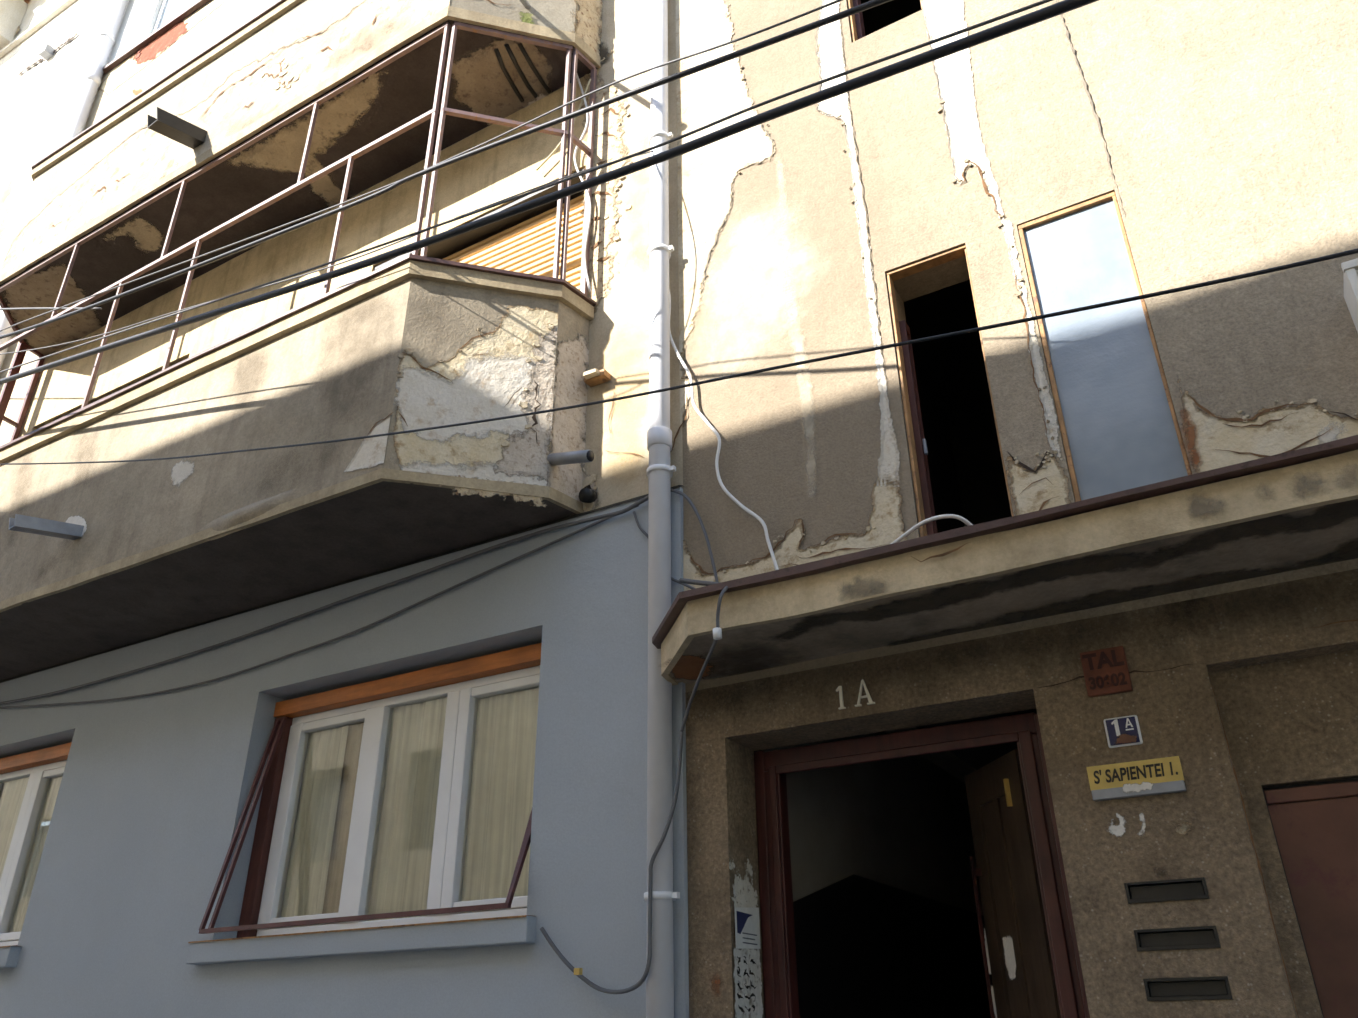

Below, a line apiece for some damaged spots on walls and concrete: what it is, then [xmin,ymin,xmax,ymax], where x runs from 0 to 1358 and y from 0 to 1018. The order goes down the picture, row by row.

peeling [344,0,633,512]
peeling [670,0,908,591]
peeling [920,0,1071,516]
water stain [709,496,1358,706]
peeling [1177,379,1358,473]
peeling [729,859,758,908]